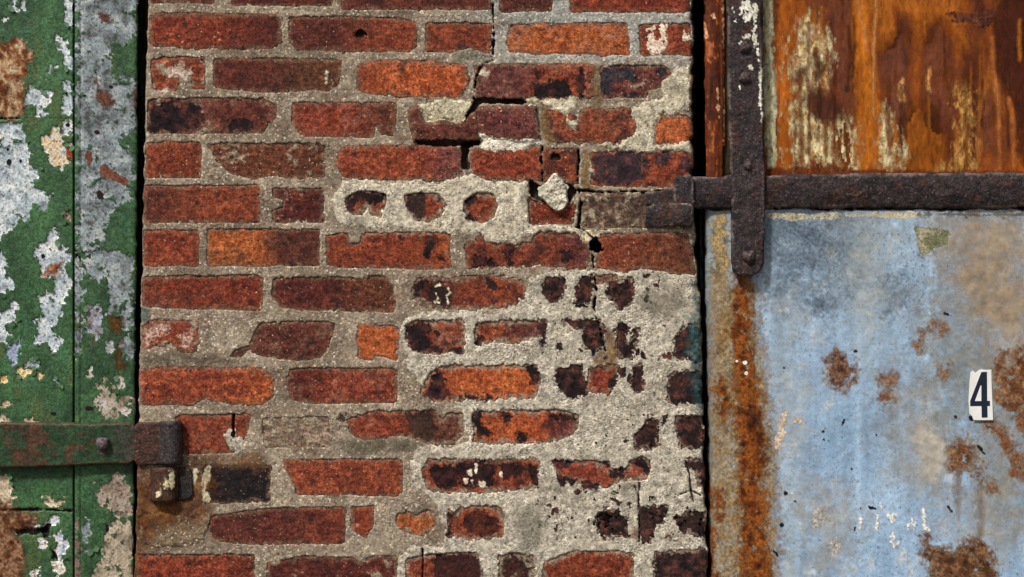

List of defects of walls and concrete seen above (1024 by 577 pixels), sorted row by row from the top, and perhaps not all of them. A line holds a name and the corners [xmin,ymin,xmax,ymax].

peeling [763,0,860,171]
peeling [878,78,908,171]
rust [765,0,1024,175]
peeling [935,85,981,172]
peeling [0,0,205,422]
peeling [0,473,17,509]
peeling [15,472,136,577]
rust [705,271,783,577]
rust [821,347,860,395]
rust [918,532,999,577]
rust [944,433,1000,494]
rust [980,345,1024,481]